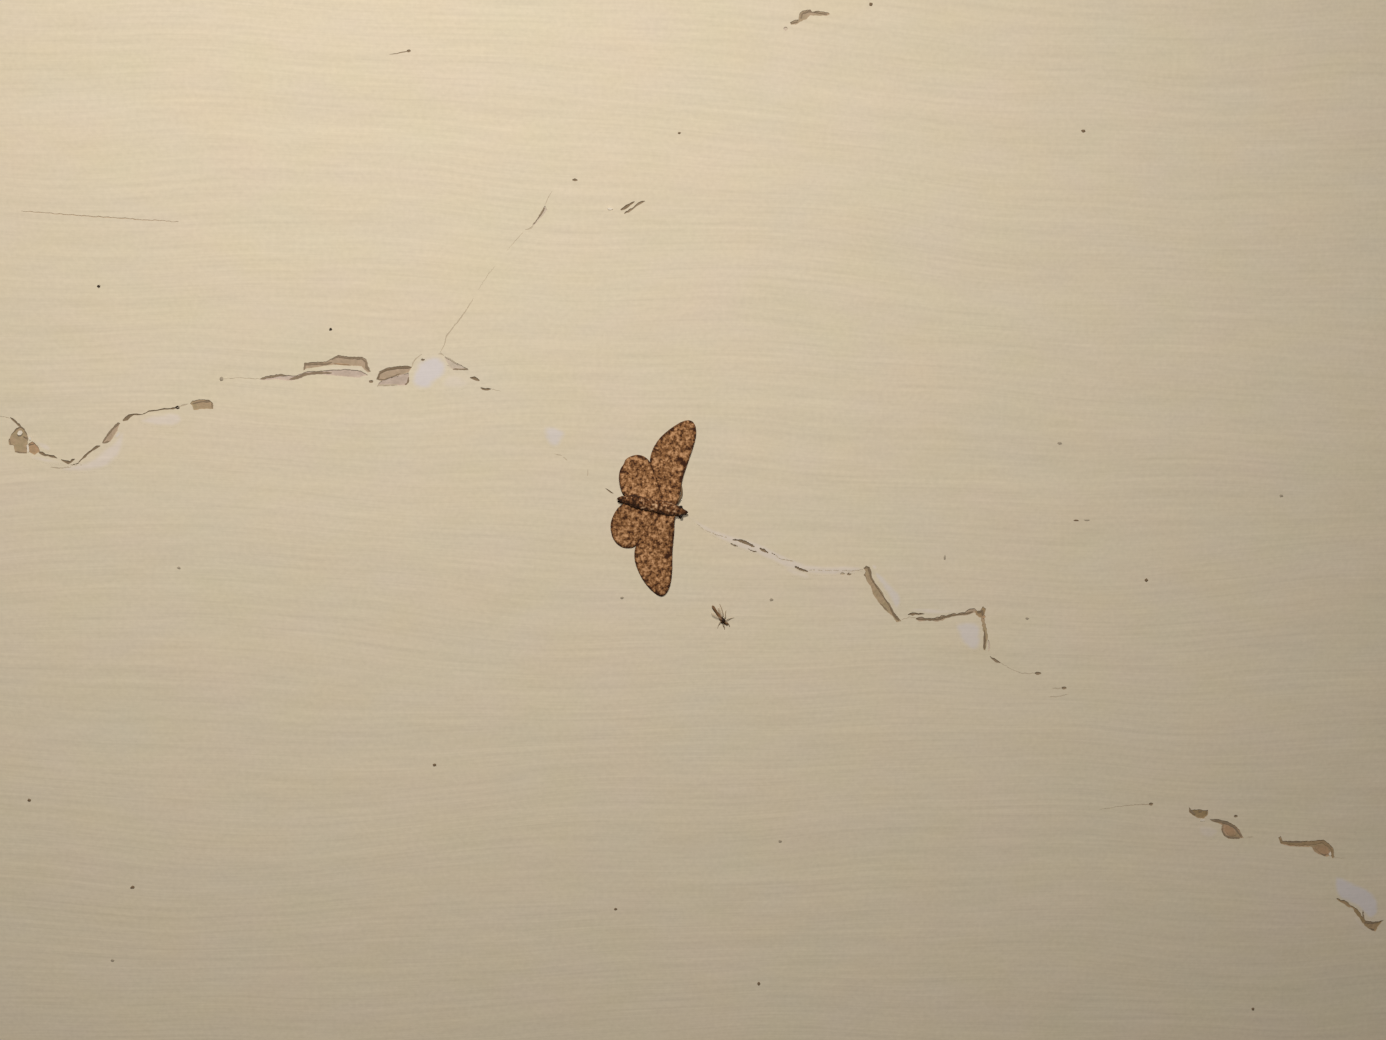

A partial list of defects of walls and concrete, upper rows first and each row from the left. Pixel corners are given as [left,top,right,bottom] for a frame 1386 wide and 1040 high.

crack [441,179,577,351]
crack [51,404,187,473]
crack [689,516,863,580]
crack [902,607,1067,697]
peeling [1279,836,1334,858]
peeling [1333,875,1383,931]